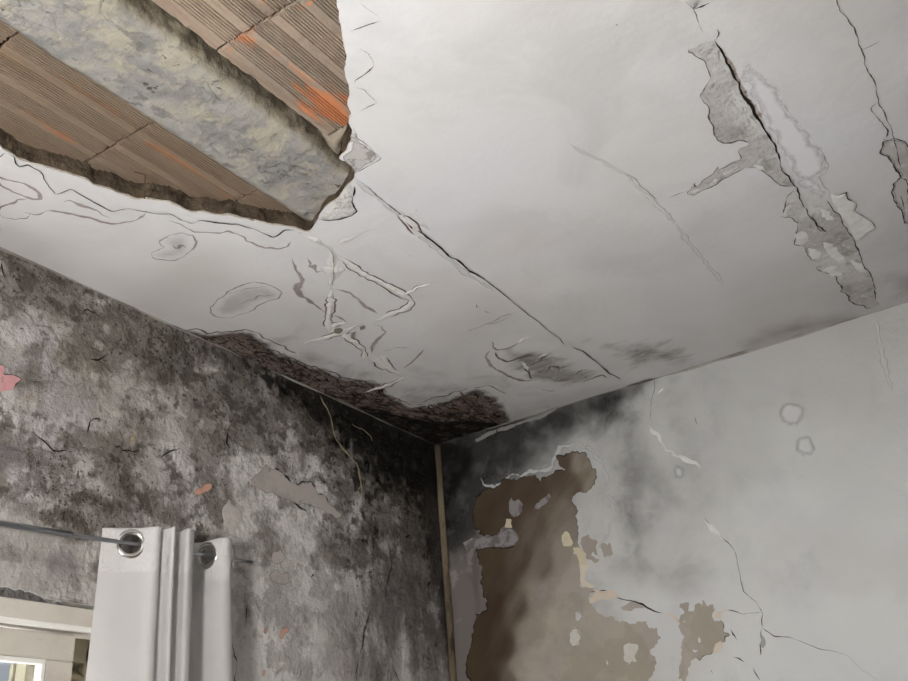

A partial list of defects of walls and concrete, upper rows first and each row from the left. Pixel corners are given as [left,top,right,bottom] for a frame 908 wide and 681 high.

leakage [0,177,145,225]
crack [0,154,286,238]
flaking render [0,79,376,233]
leakage [152,220,291,261]
leakage [292,258,323,311]
crack [356,135,621,380]
peeling [687,41,879,309]
crack [836,0,901,178]
leakage [175,326,652,681]
peeling [463,451,661,681]
crack [592,590,661,613]
peeling [666,600,737,681]